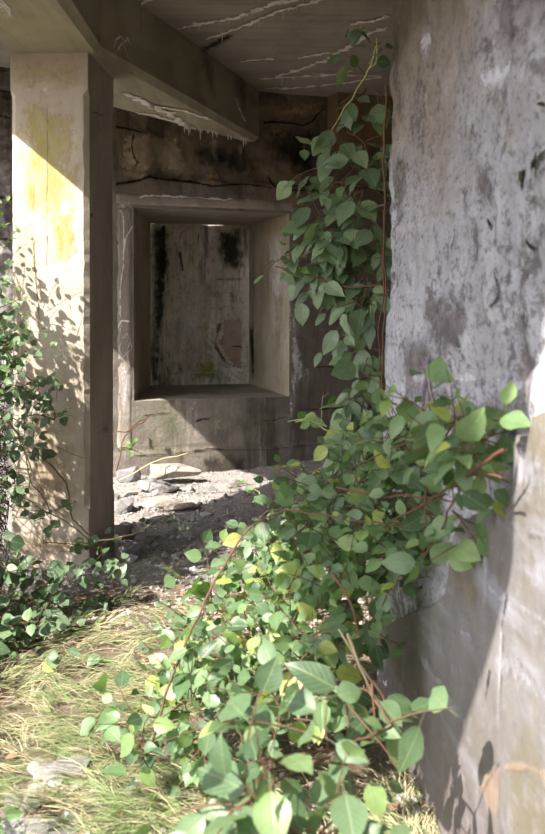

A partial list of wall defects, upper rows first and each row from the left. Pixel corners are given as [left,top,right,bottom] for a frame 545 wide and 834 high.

crack [177,0,321,41]
crack [241,15,390,91]
crack [93,92,325,363]
damp [218,229,243,270]
damp [153,226,216,380]